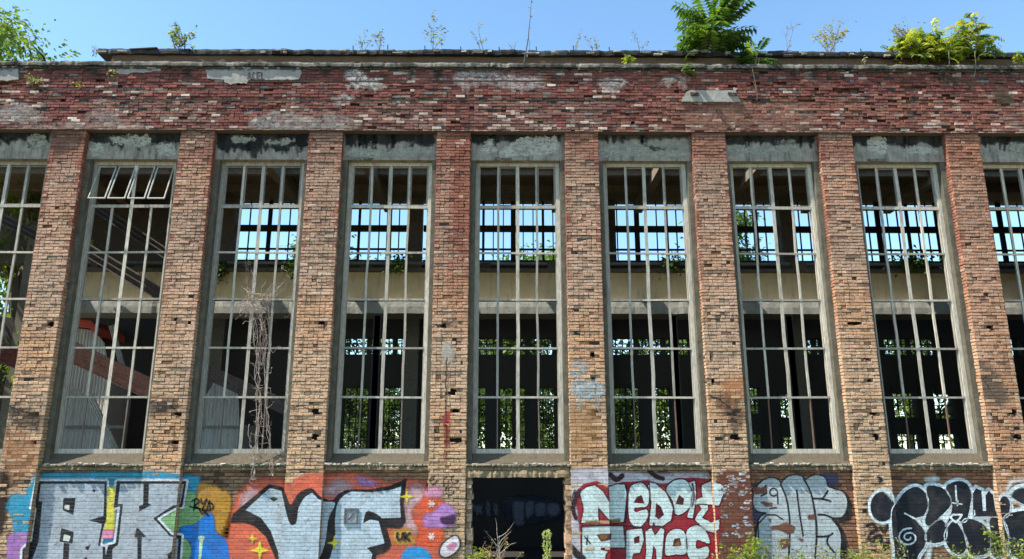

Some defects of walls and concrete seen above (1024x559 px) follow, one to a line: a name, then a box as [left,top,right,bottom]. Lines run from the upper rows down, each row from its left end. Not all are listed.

flaking render [88,134,177,157]
flaking render [867,136,889,162]
flaking render [905,145,938,155]
peeling [715,462,810,559]